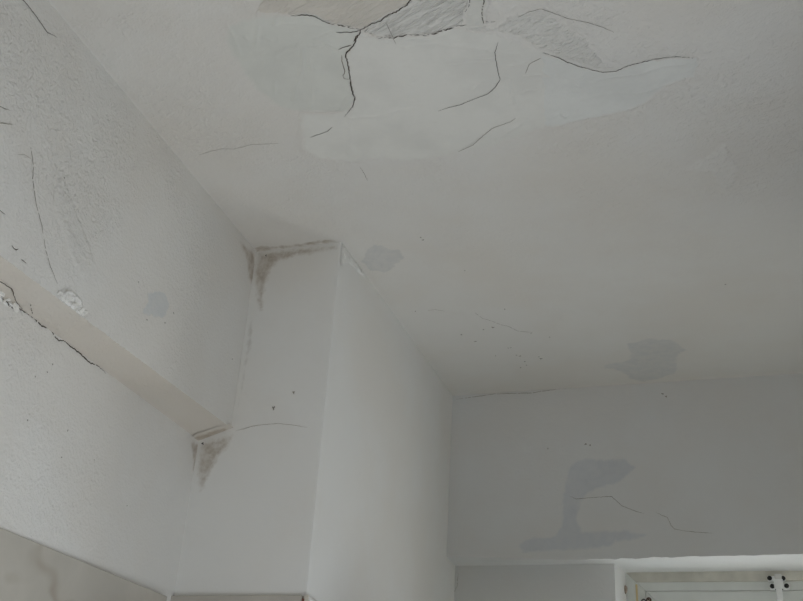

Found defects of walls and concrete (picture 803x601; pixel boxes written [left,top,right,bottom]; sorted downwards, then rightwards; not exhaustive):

crack [298,0,495,137]
damp [236,233,340,319]
damp [188,424,240,500]
damp [514,454,653,553]